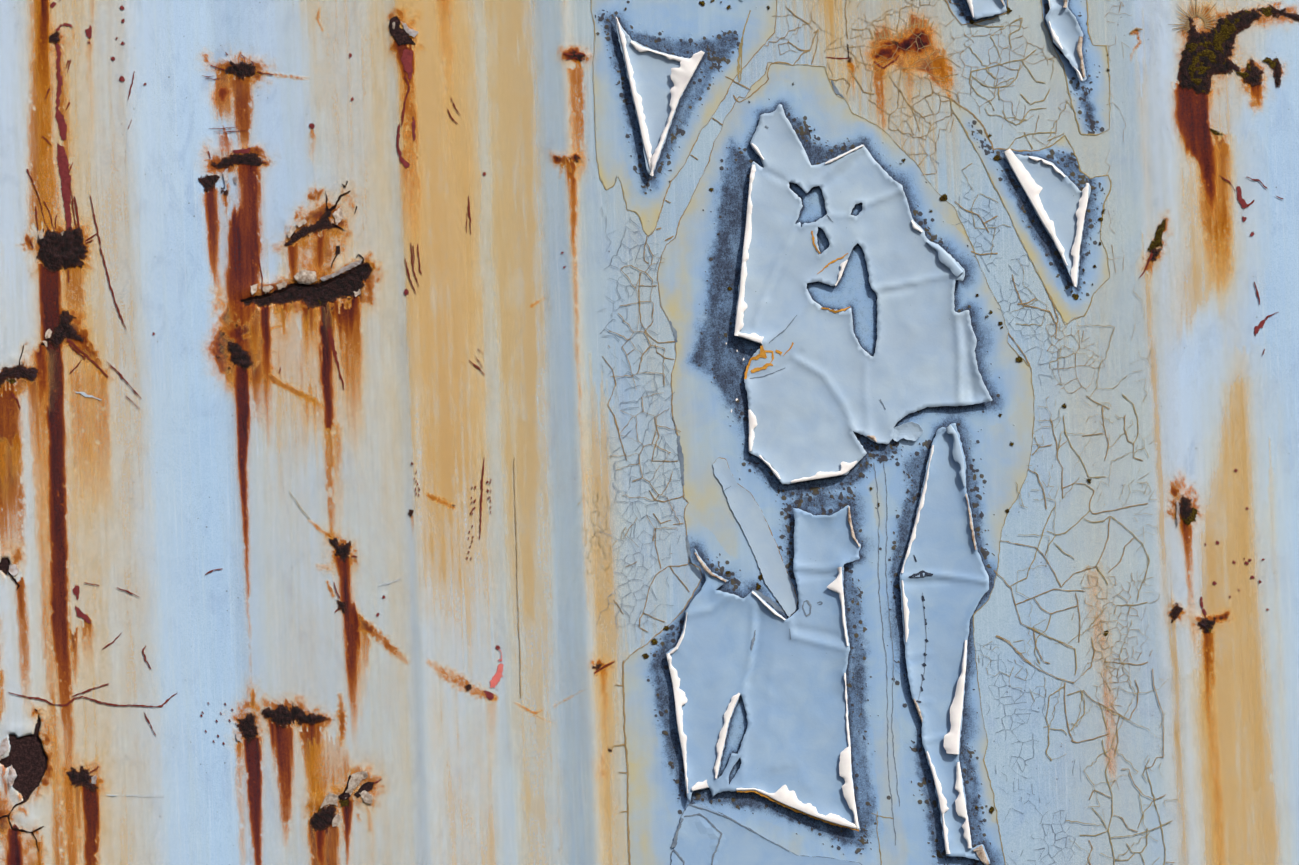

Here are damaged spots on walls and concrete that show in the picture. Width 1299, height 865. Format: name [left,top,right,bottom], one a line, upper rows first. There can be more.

rust [202,52,299,149]
rust [552,46,589,268]
rust [826,14,953,124]
peeling [950,0,1112,325]
rust [1168,0,1299,276]
rust [22,0,111,865]
rust [208,302,322,595]
rust [200,491,405,865]
crack [578,176,690,865]
peeling [591,0,1035,865]
crack [712,0,1185,865]
rust [1167,589,1240,801]